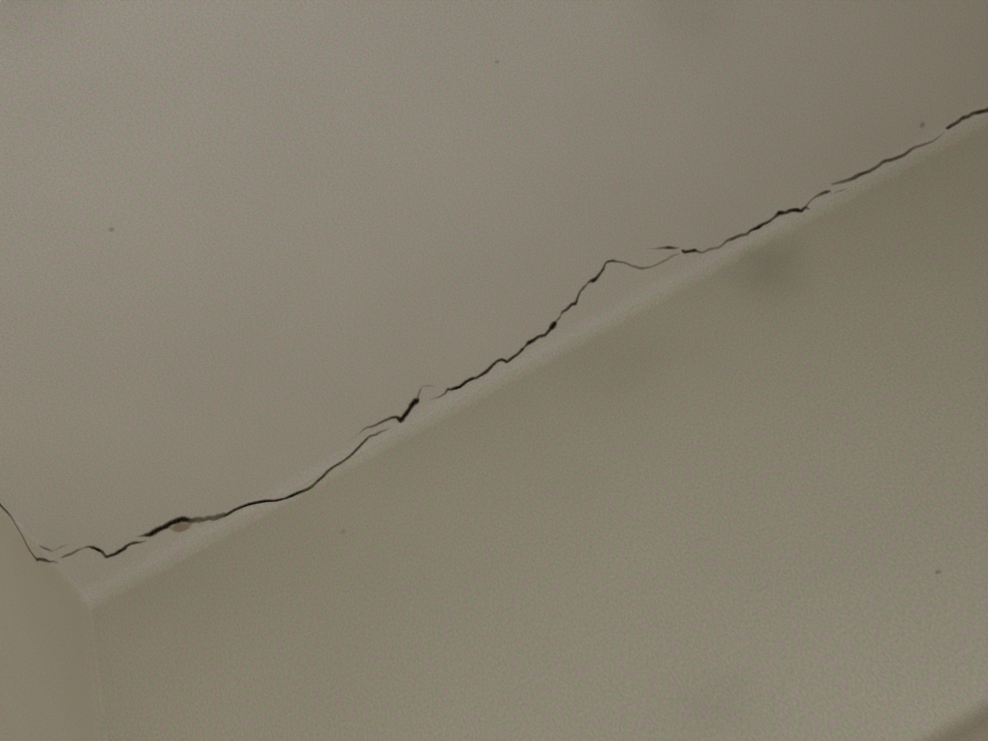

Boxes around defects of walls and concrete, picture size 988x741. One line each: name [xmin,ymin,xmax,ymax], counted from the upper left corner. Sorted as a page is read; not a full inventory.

crack [946,108,988,129]
crack [727,149,911,241]
crack [664,245,700,253]
crack [445,260,617,394]
crack [32,398,419,562]